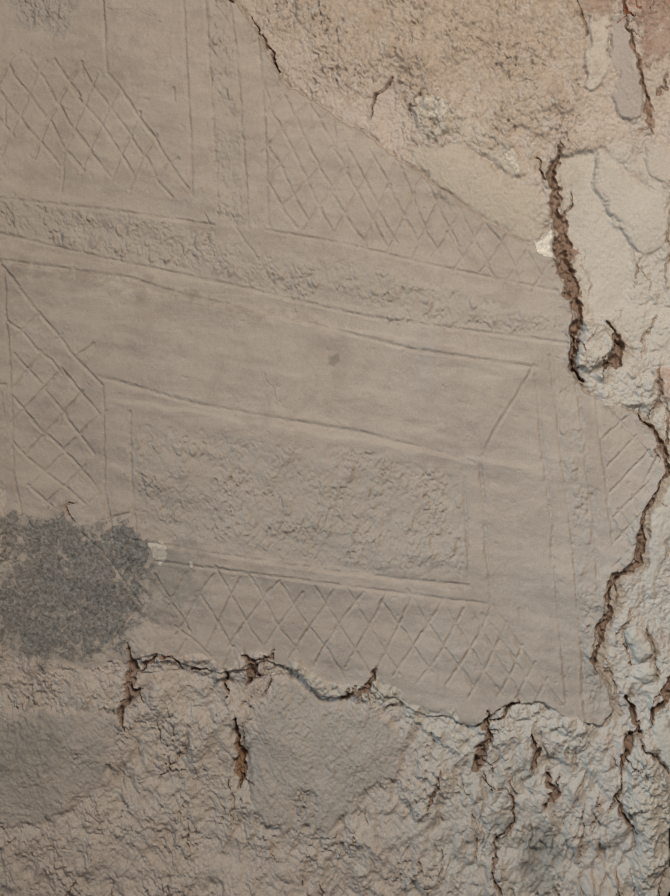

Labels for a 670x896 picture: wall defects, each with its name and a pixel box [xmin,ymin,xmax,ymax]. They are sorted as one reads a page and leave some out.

spalling [9,0,78,40]
crack [617,0,669,134]
spalling [411,102,522,177]
spalling [579,368,660,413]
crack [537,146,670,862]
water stain [0,511,167,671]
crack [117,644,275,834]
spalling [139,651,273,683]
crack [341,668,398,709]
spalling [291,661,592,759]
crack [472,702,521,895]
crack [530,734,562,809]